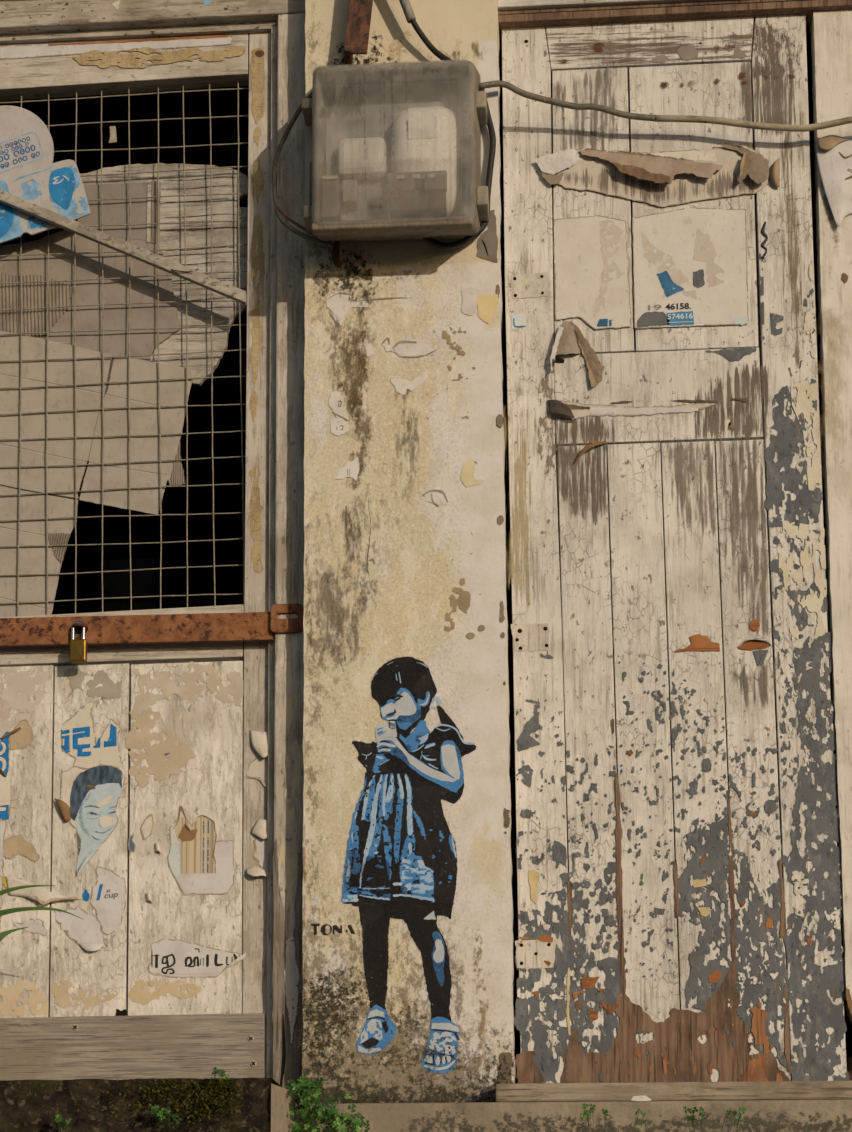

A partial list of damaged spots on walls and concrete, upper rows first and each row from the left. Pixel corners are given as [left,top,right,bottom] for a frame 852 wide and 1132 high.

peeling [72,47,265,434]
leakage [314,250,420,488]
peeling [326,292,413,325]
peeling [365,327,476,395]
peeling [477,285,500,324]
peeling [330,417,349,436]
peeling [249,466,264,573]
leakage [307,505,377,653]
peeling [497,22,850,1101]
peeling [64,668,94,692]
leakage [473,937,488,1075]